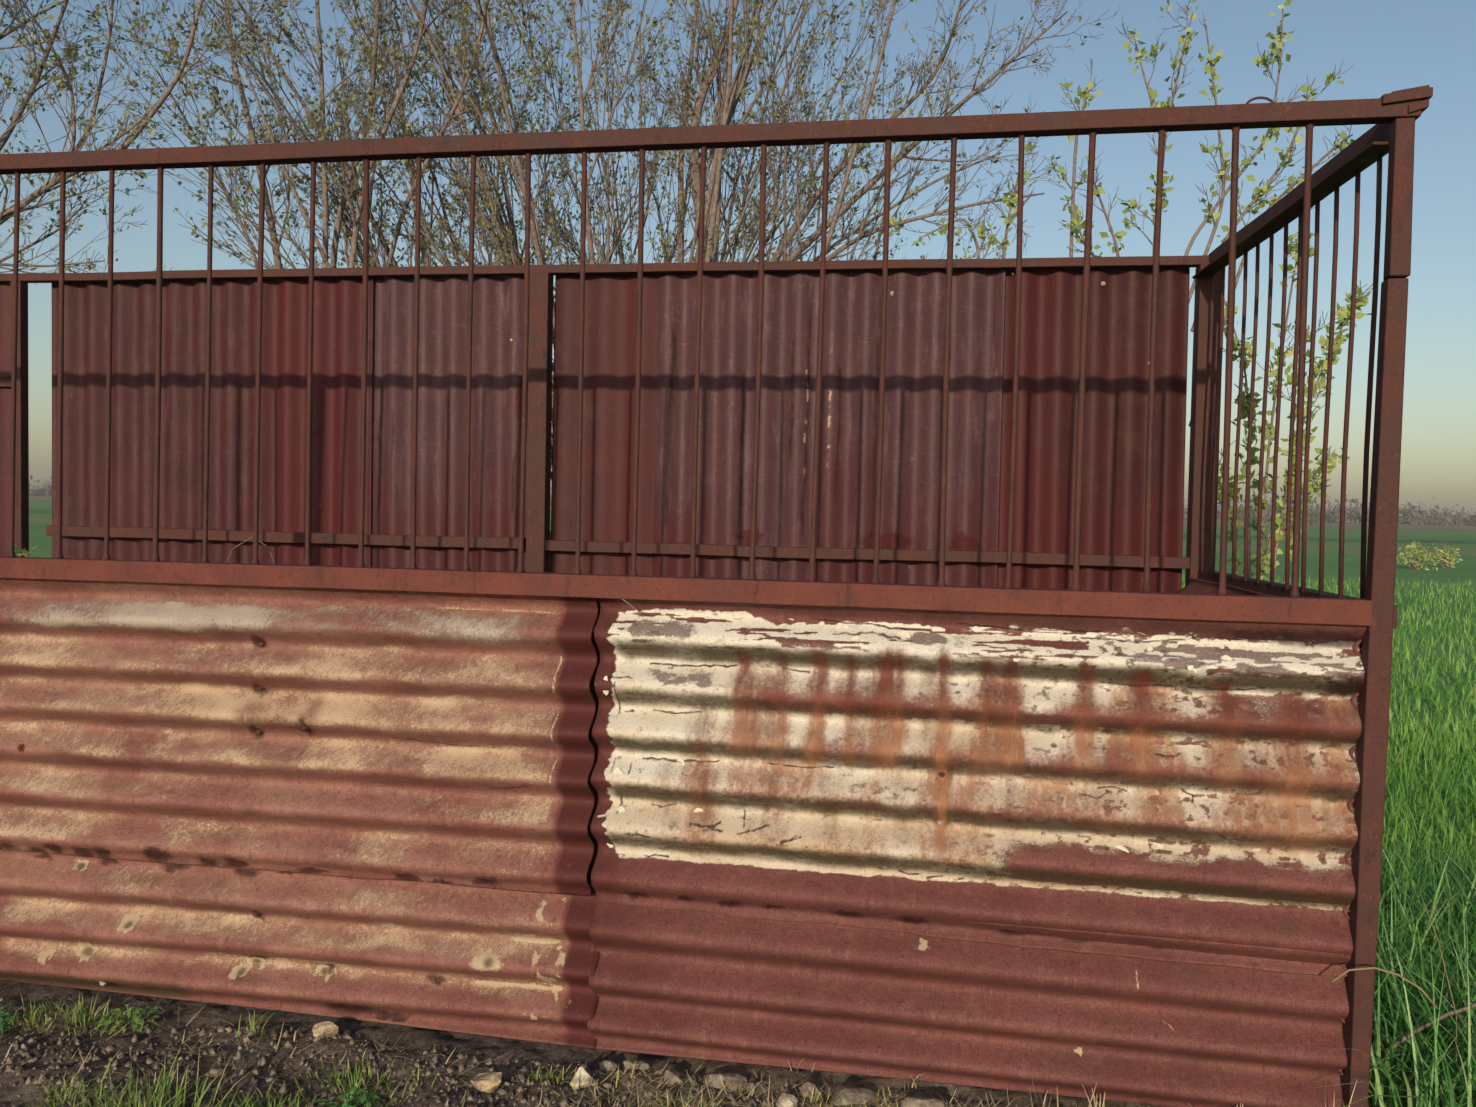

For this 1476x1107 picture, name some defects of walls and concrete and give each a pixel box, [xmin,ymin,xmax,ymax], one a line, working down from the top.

peeling [597,608,1364,912]
rust [683,651,1359,867]